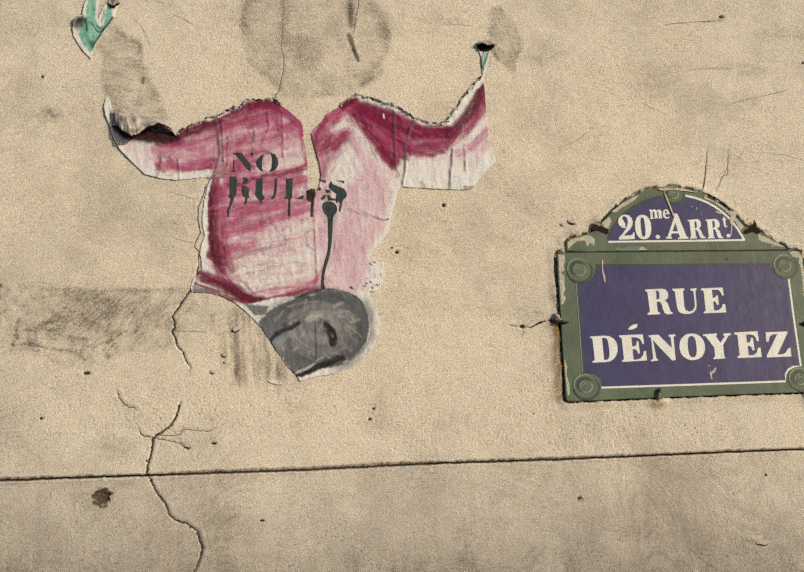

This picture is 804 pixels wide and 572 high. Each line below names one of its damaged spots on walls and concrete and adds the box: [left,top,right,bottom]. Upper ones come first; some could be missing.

crack [166,183,207,369]
spalling [92,488,114,508]
crack [139,404,213,572]